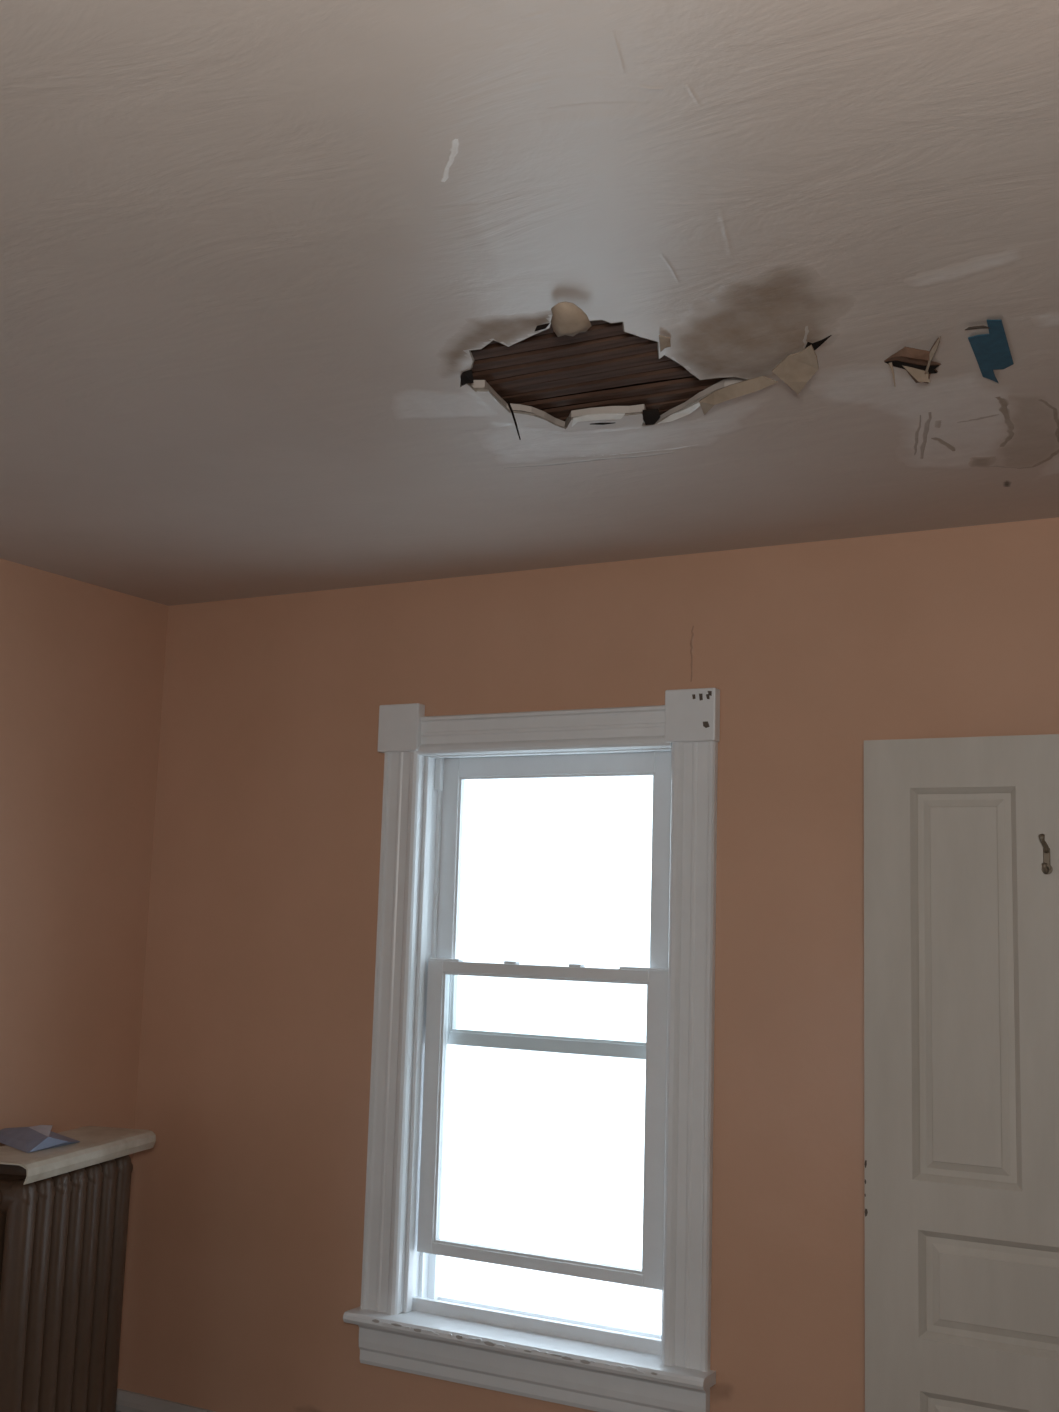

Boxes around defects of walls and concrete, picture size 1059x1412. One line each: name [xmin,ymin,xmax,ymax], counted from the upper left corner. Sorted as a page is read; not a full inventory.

spalling [460,320,747,429]
peeling [808,363,1059,487]